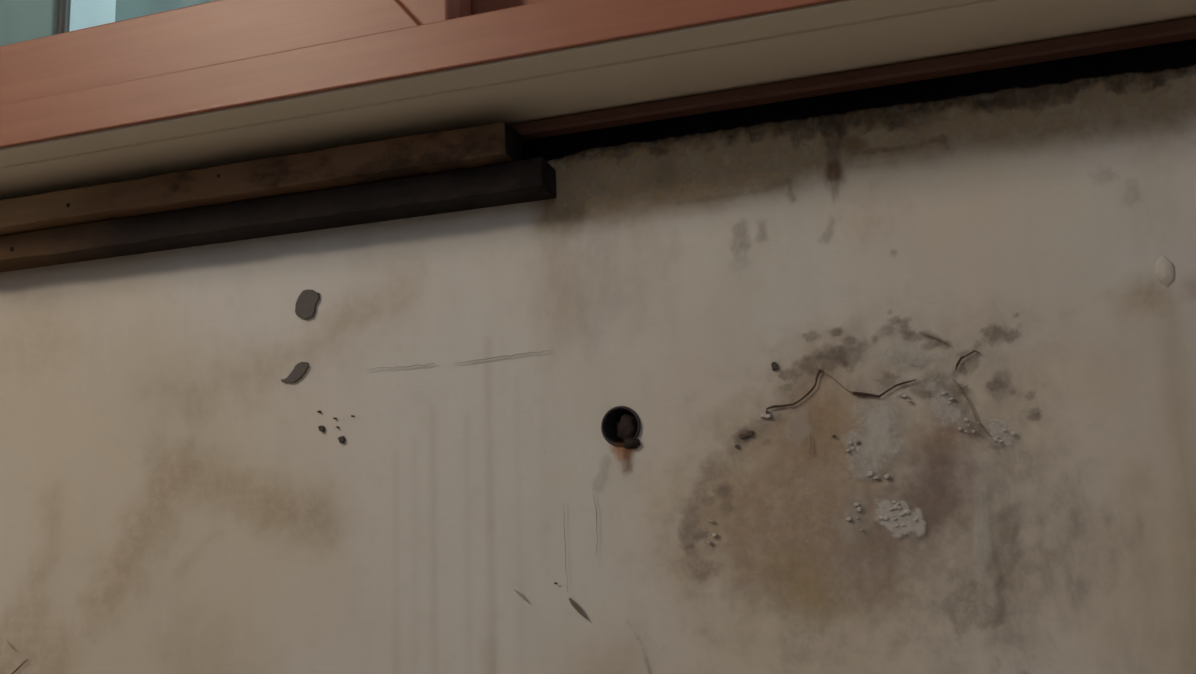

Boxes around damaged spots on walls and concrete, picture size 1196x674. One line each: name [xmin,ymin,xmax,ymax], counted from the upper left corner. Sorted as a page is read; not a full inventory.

leakage [521,39,1196,219]
crack [766,369,917,412]
crack [919,332,997,443]
peeling [832,405,899,479]
peeling [845,500,926,538]